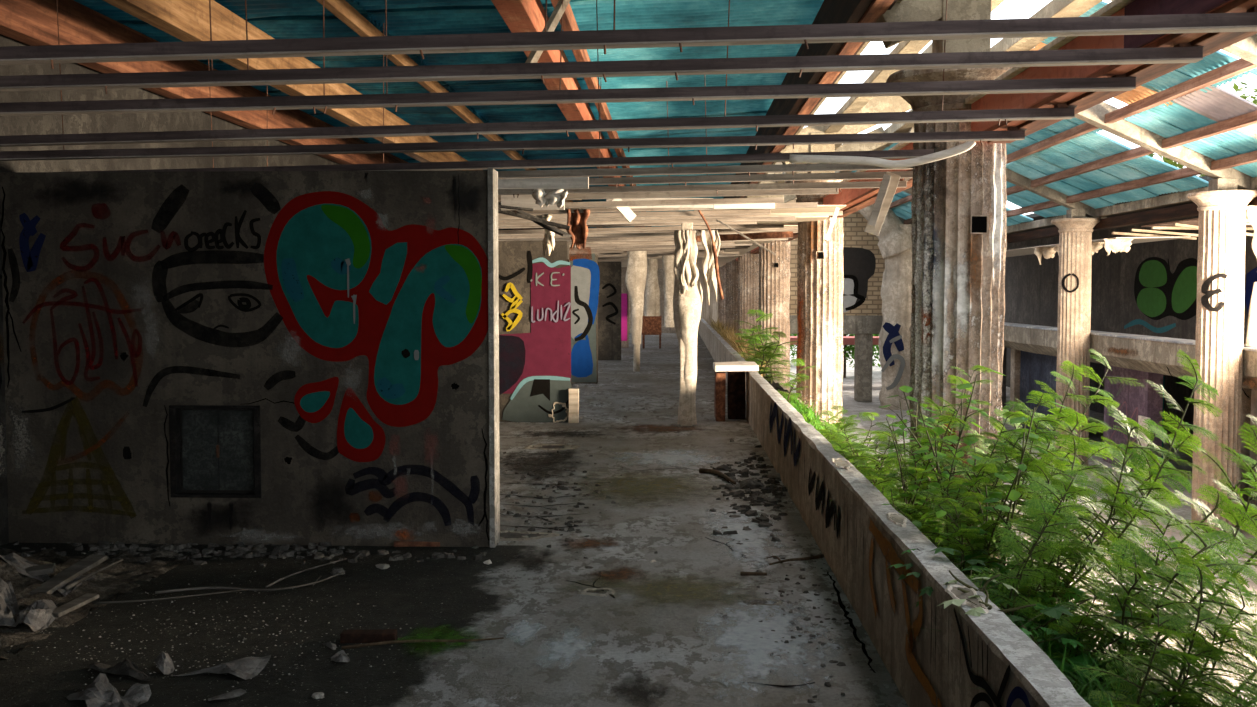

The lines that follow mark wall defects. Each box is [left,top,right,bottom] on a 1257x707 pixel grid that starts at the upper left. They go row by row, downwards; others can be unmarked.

corrosion [922,313,931,342]
water stain [499,430,697,502]
crack [827,572,876,673]